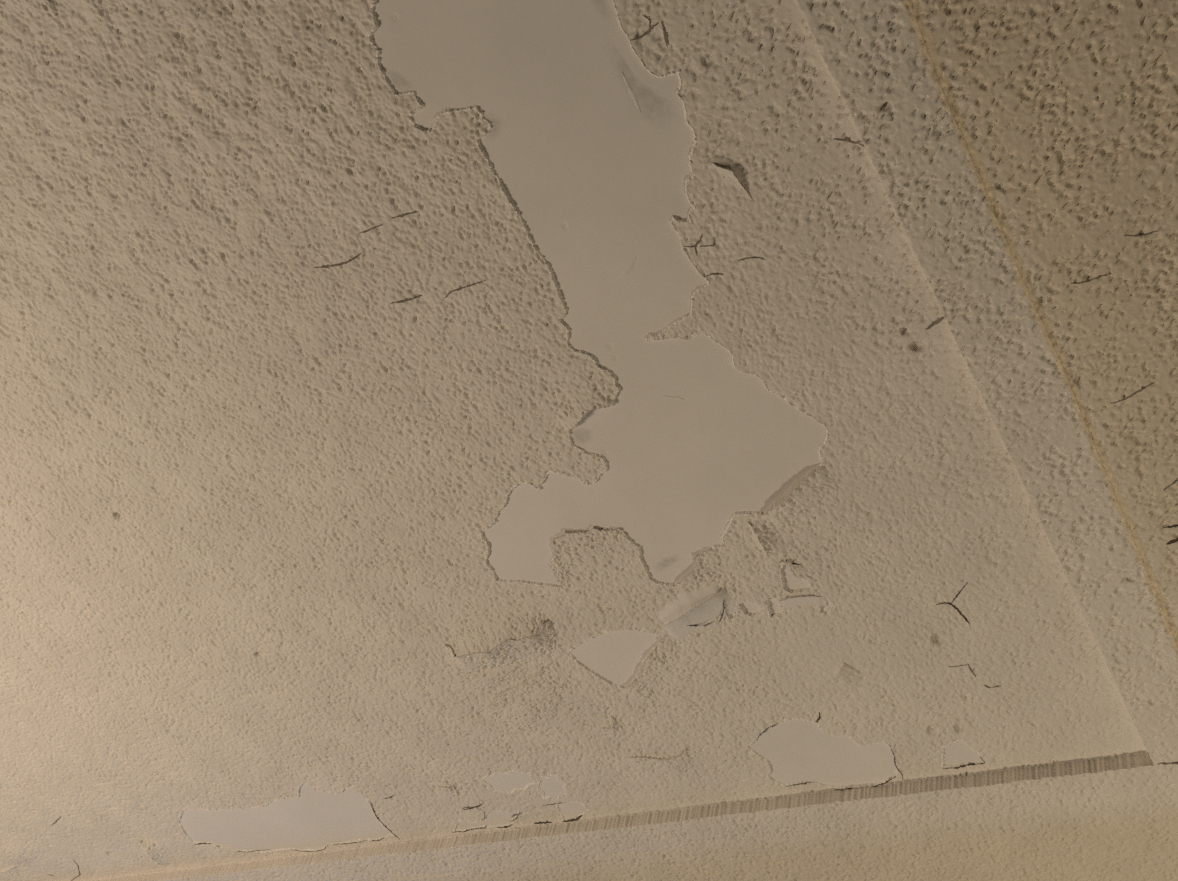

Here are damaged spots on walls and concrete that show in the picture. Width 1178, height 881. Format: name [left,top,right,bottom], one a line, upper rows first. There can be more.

peeling [367,0,839,619]
peeling [445,612,559,674]
peeling [746,718,898,789]